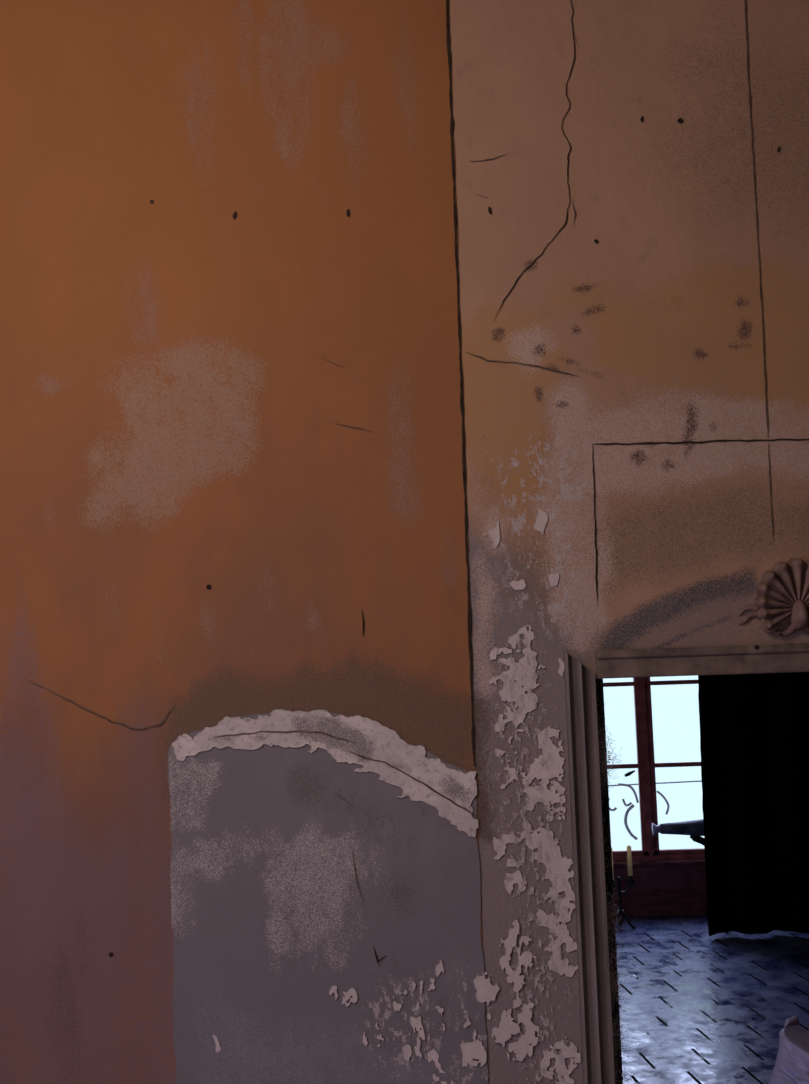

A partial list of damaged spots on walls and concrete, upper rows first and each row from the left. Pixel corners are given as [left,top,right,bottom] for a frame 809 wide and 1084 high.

crack [495,0,579,318]
leakage [77,255,270,538]
crack [466,352,578,377]
crack [25,679,174,730]
peeling [171,271,632,1084]
leakage [0,323,809,1084]